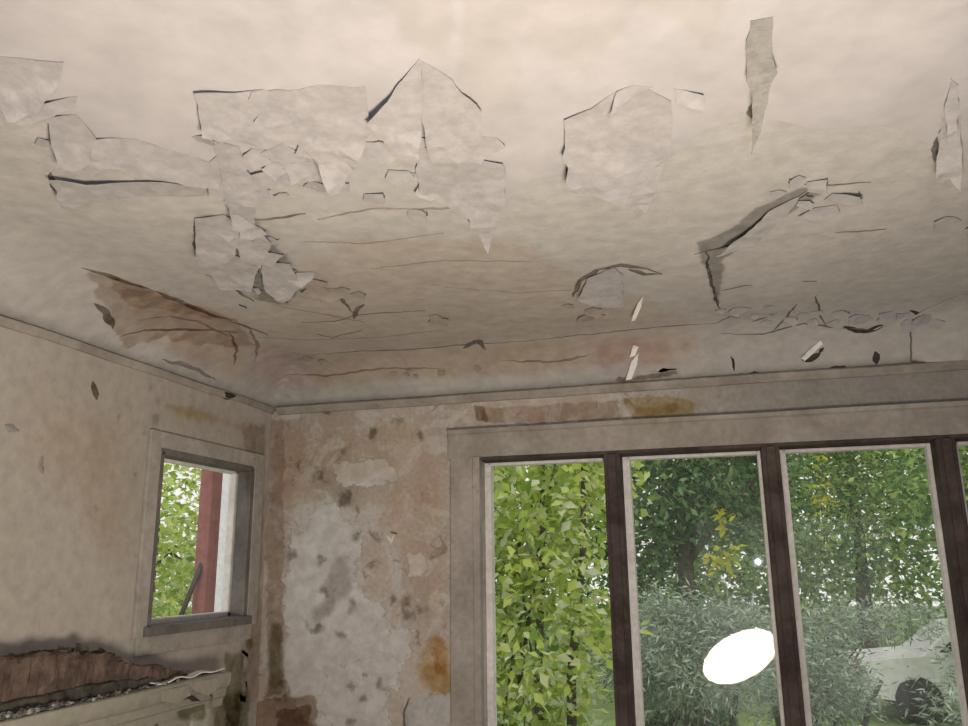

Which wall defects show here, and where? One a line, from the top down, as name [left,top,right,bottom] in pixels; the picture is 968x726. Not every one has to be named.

peeling [0,0,968,323]
crack [804,182,871,197]
crack [836,227,886,235]
crack [301,281,922,355]
peeling [162,359,217,381]
peeling [278,356,445,380]
peeling [626,345,639,380]
peeling [332,458,399,489]
peeling [405,551,427,577]
peeling [275,495,415,726]